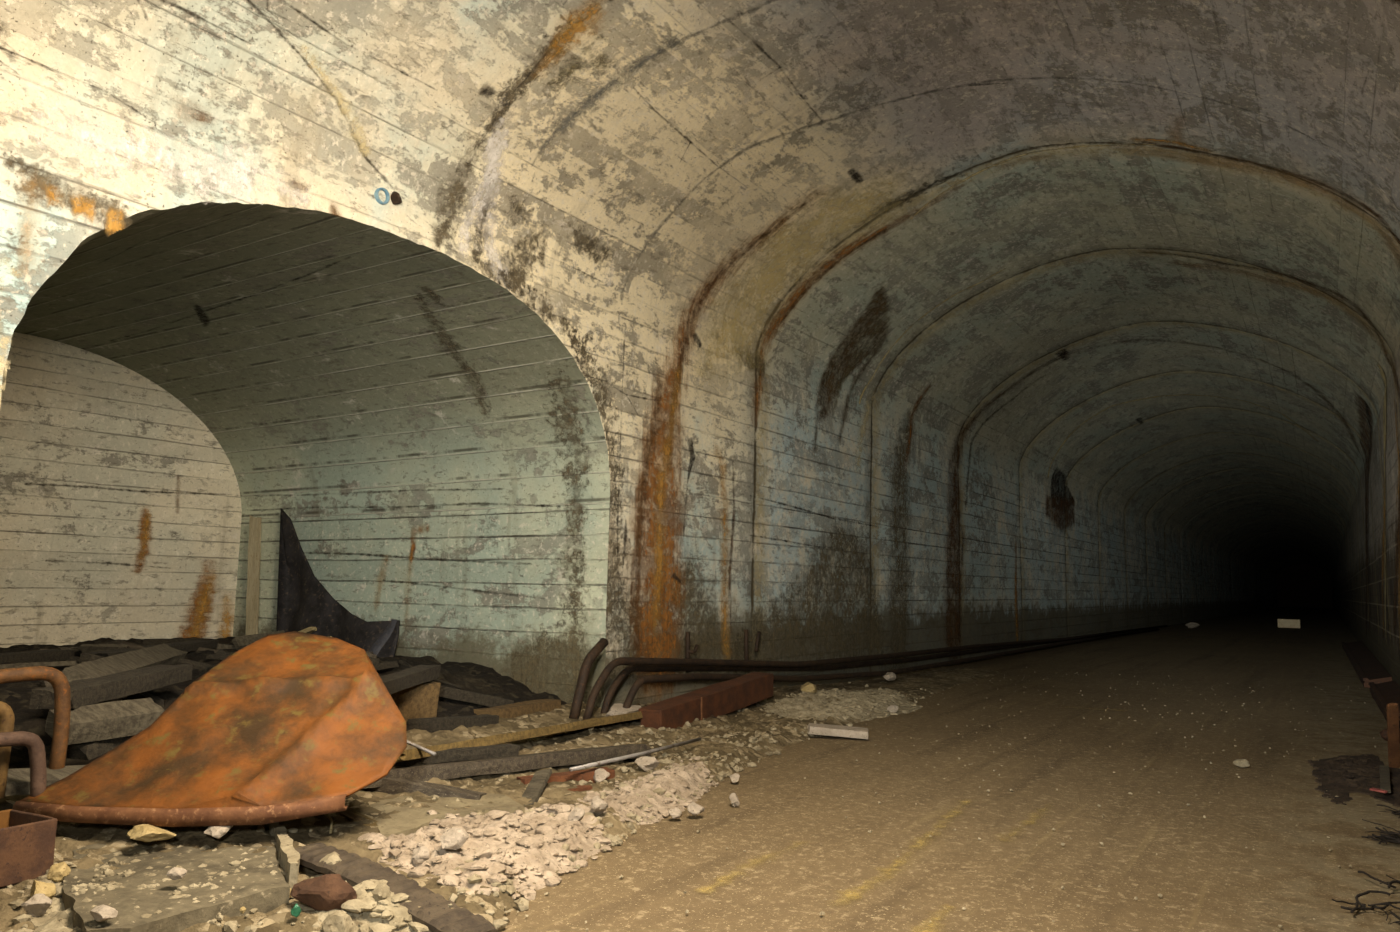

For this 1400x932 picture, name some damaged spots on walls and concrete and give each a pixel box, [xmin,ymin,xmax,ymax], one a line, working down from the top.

peeling [20,103,307,204]
damp [709,145,1108,375]
rust [135,509,150,573]
rust [180,565,232,638]
rust [631,204,804,701]
damp [612,387,929,674]
damp [814,269,1004,465]
rust [946,370,1036,659]
damp [1046,496,1075,529]